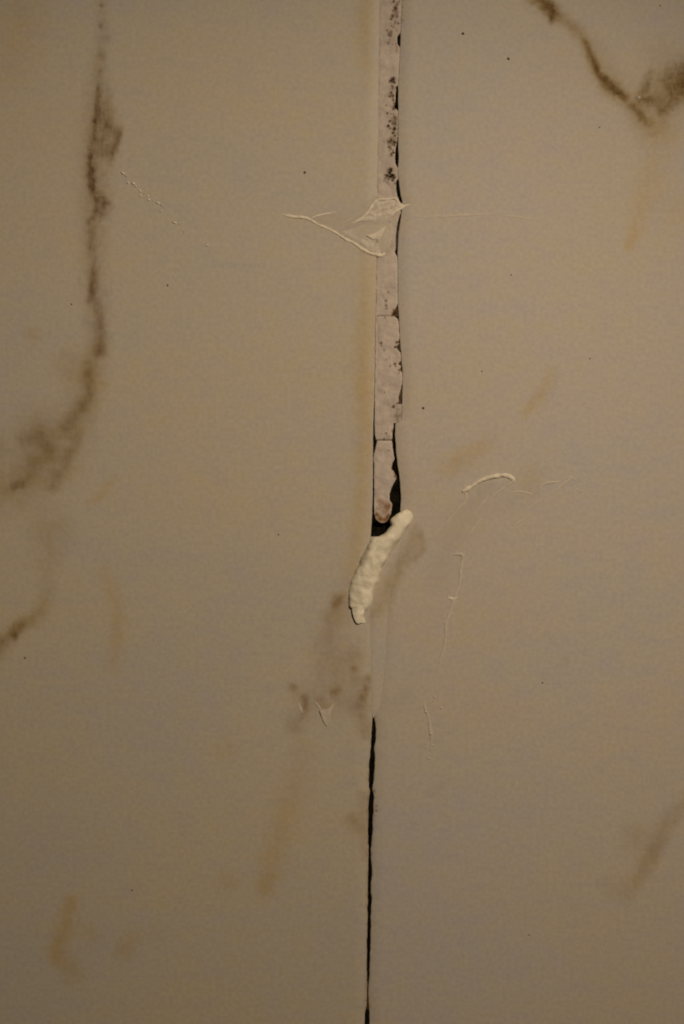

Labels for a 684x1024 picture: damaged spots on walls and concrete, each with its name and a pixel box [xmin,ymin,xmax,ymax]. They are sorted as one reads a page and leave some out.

crack [394,137,402,255]
crack [372,304,402,522]
crack [365,718,376,1024]